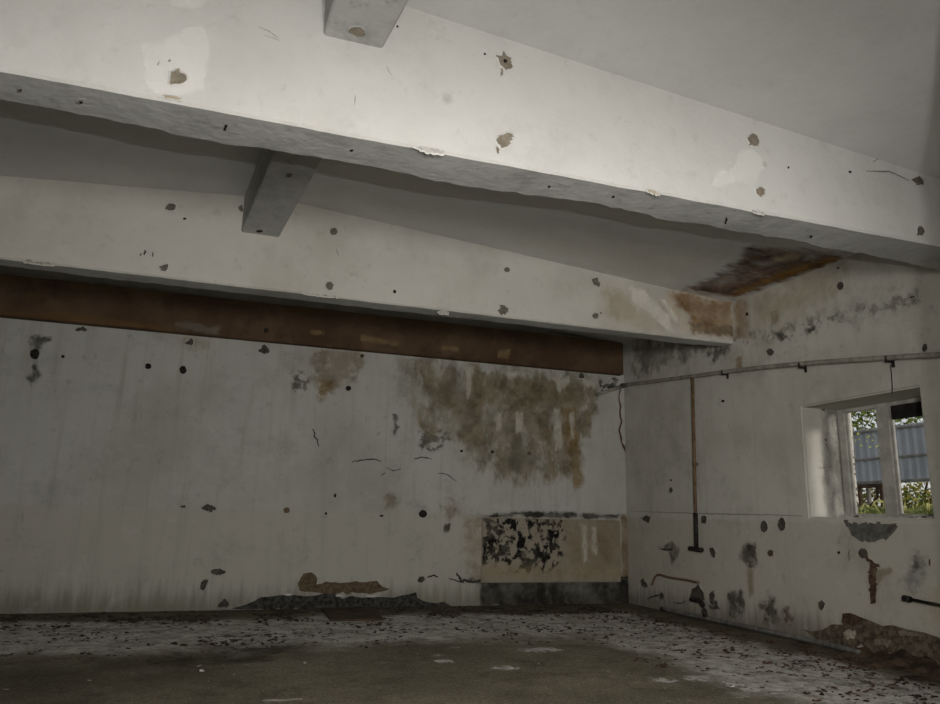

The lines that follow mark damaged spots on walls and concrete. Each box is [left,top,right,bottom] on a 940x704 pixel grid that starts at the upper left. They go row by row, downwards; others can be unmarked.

spalling [157,60,189,102]
spalling [493,48,515,76]
water stain [418,430,450,451]
crack [618,385,626,453]
peeling [482,518,565,573]
spalling [844,519,903,604]
spalling [215,572,450,609]
spalling [804,613,940,665]